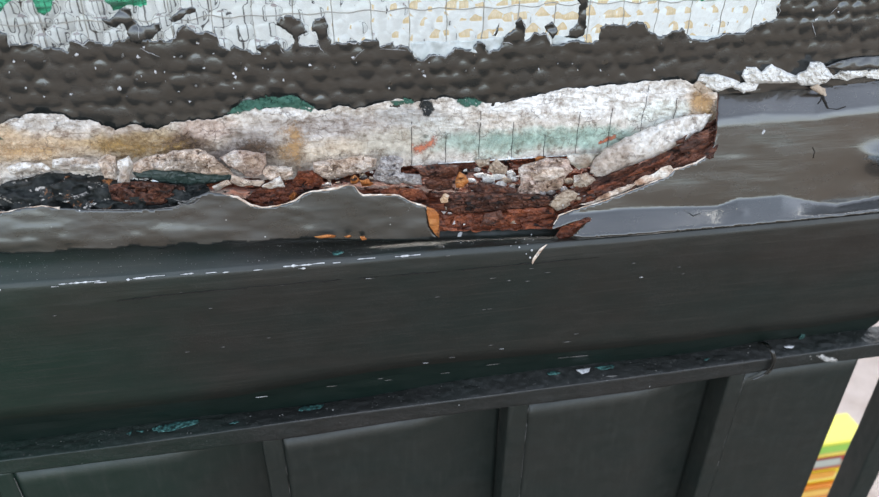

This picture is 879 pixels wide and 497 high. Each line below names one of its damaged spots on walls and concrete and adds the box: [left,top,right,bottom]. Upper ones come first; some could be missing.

peeling [0,0,879,131]
peeling [0,156,673,270]
rust [556,92,719,239]